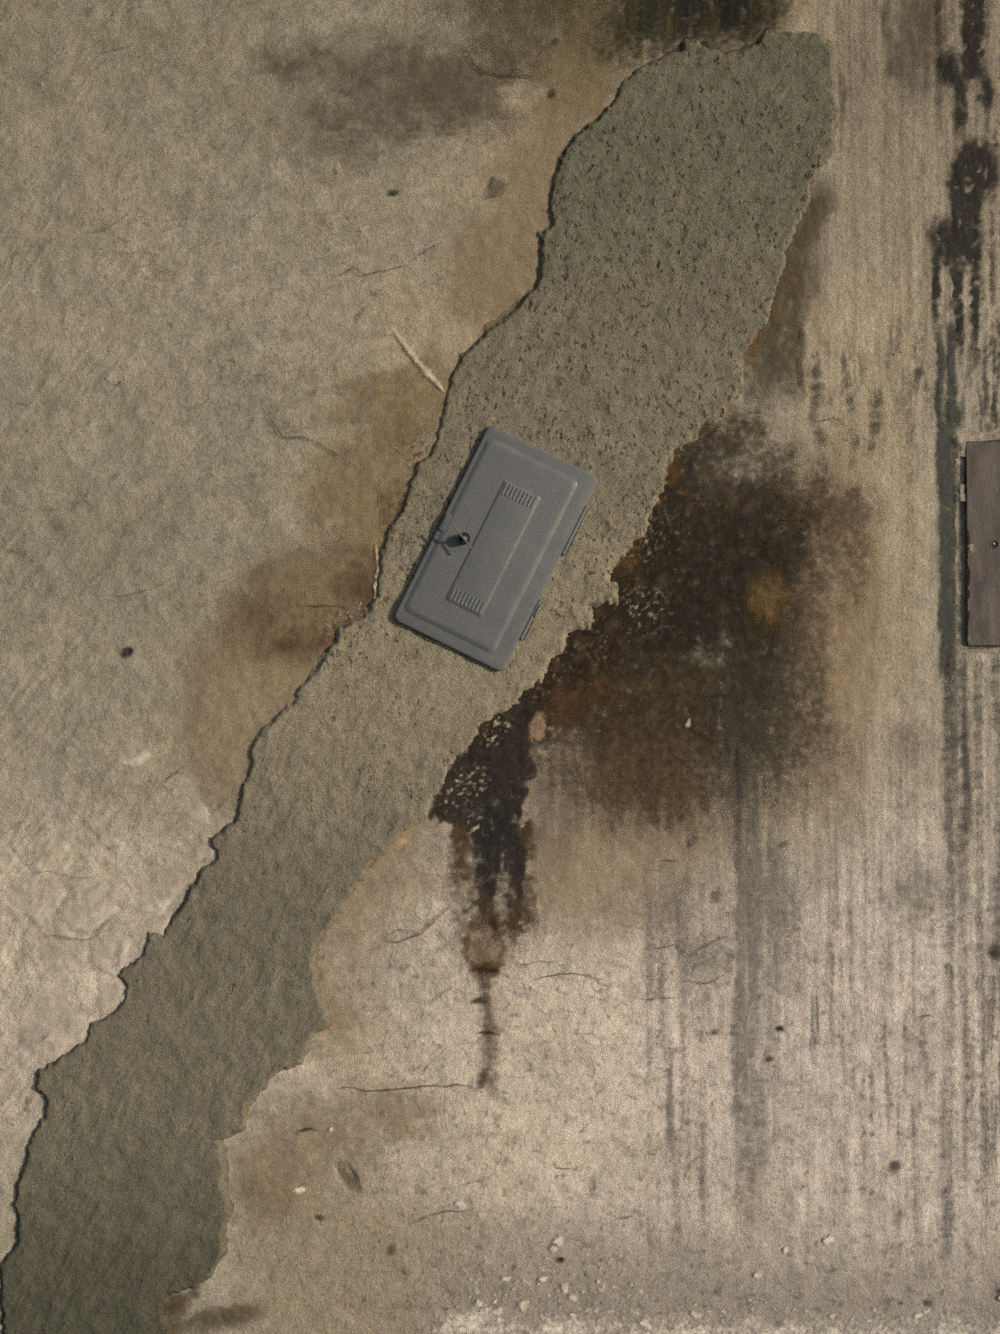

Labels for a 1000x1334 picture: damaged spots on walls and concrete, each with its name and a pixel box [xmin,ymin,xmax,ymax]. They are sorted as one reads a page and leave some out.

water stain [458,0,632,318]
water stain [191,359,449,796]
water stain [882,0,1000,1065]
peeling [118,746,152,767]
peeling [186,801,211,825]
peeling [529,712,553,741]
water stain [429,411,879,1187]
peeling [0,845,211,973]
peeling [21,990,120,1054]